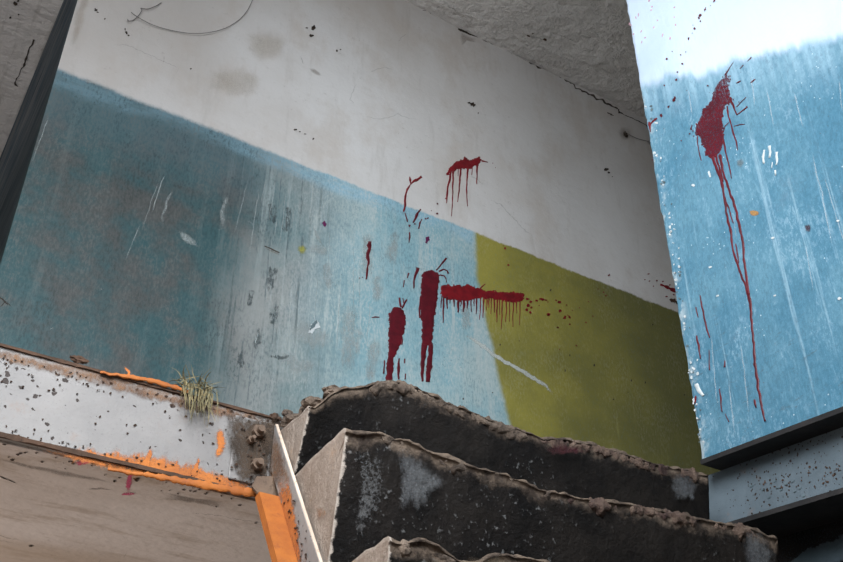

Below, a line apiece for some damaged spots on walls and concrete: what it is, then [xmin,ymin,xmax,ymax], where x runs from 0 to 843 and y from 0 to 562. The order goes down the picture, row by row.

crack [14,39,35,87]
rust [0,352,260,421]
spalling [369,380,529,440]
rust [57,450,257,497]
rust [216,430,226,455]
peeling [357,460,383,533]
peeling [402,457,440,501]
spalling [541,438,668,476]
spalling [398,539,422,557]